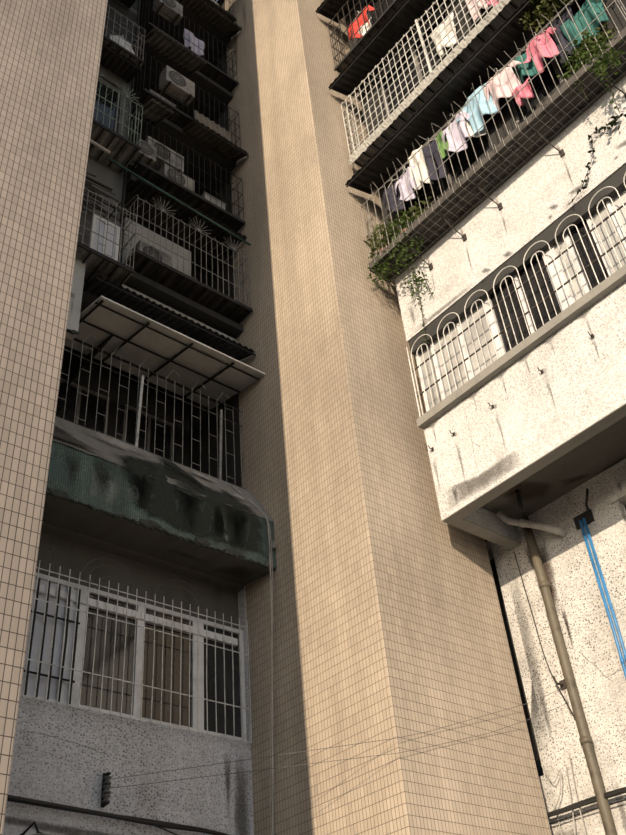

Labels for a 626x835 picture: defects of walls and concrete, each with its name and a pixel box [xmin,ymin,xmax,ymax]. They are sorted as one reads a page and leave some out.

leakage [453,464,502,497]